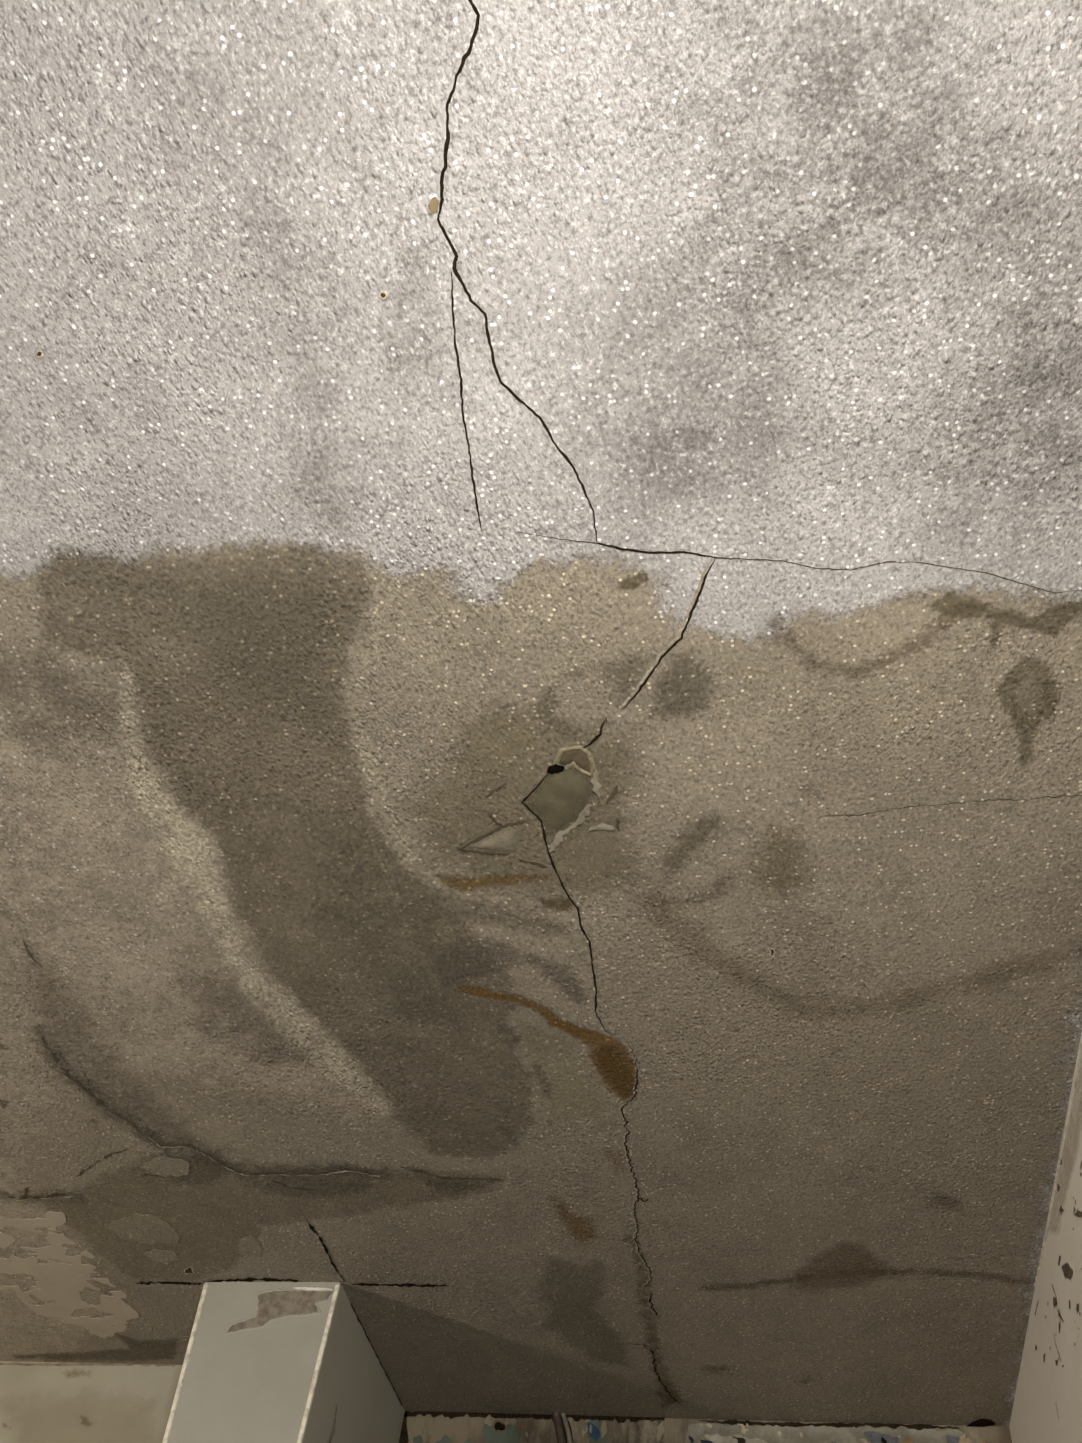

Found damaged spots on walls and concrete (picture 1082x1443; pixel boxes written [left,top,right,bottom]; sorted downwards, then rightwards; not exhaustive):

crack [433,0,1078,748]
spalling [547,745,595,776]
crack [828,795,1082,816]
peeling [0,691,365,1362]
damp [0,542,1082,1441]
corrosion [460,986,636,1100]
crack [521,774,687,1408]
crack [4,1028,503,1406]
spalling [1045,1297,1080,1346]
peeling [1058,1256,1082,1281]
peeling [413,1415,534,1443]
peeling [685,1419,995,1443]